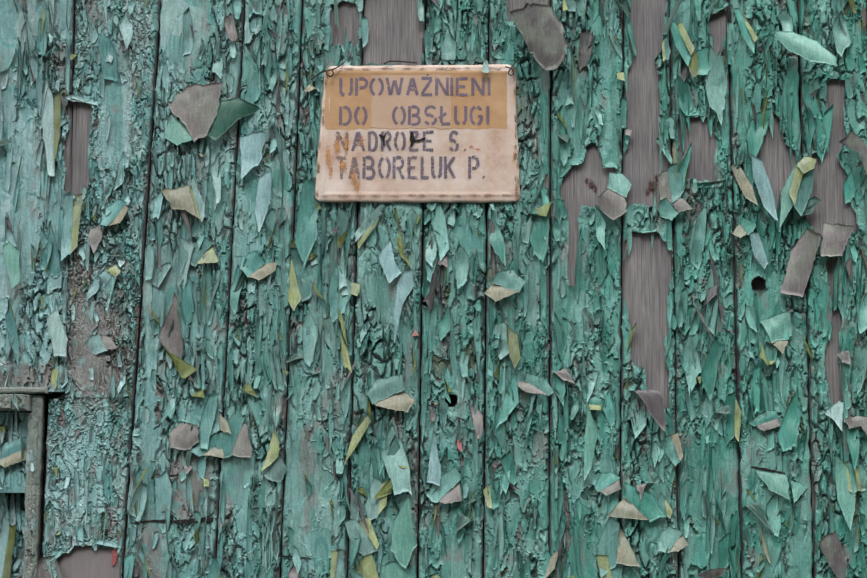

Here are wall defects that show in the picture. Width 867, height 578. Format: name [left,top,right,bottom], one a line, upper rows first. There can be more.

peeling [0,0,486,578]
peeling [422,0,867,578]